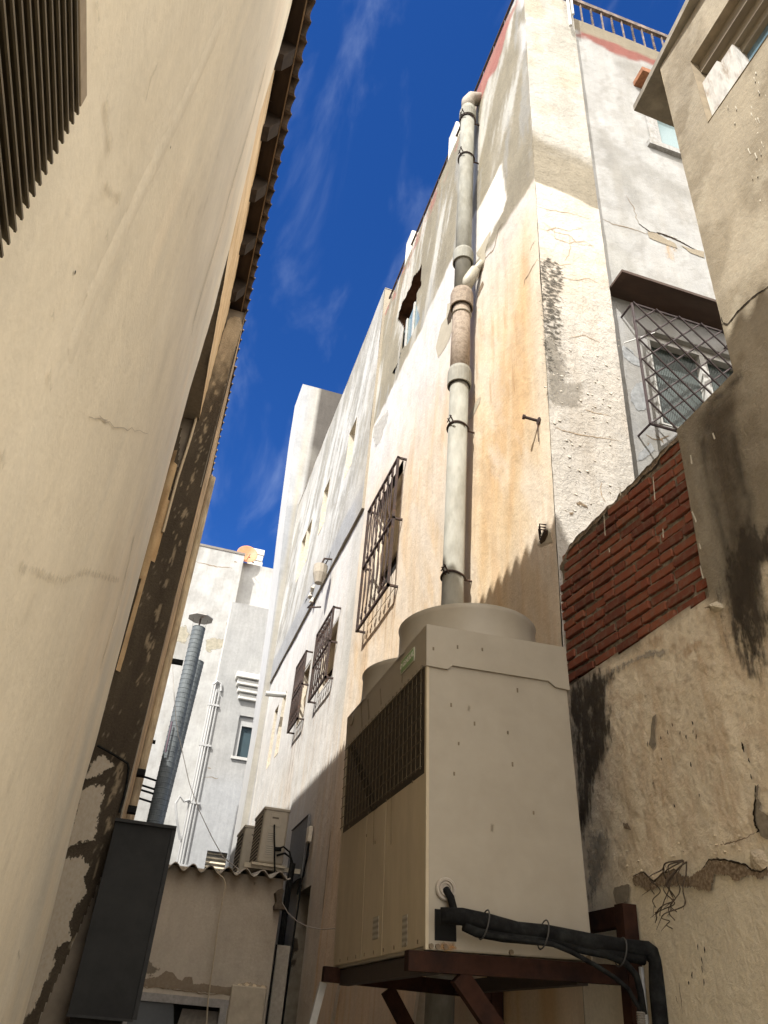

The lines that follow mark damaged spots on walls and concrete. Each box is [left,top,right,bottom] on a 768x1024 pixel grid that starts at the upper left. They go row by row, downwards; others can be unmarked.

crack [524,197,705,284]
mould [539,258,583,406]
crack [90,416,147,434]
crack [554,409,619,441]
leakage [703,403,768,680]
peeling [23,755,114,1023]
leakage [569,649,665,899]
flaking render [613,742,768,904]